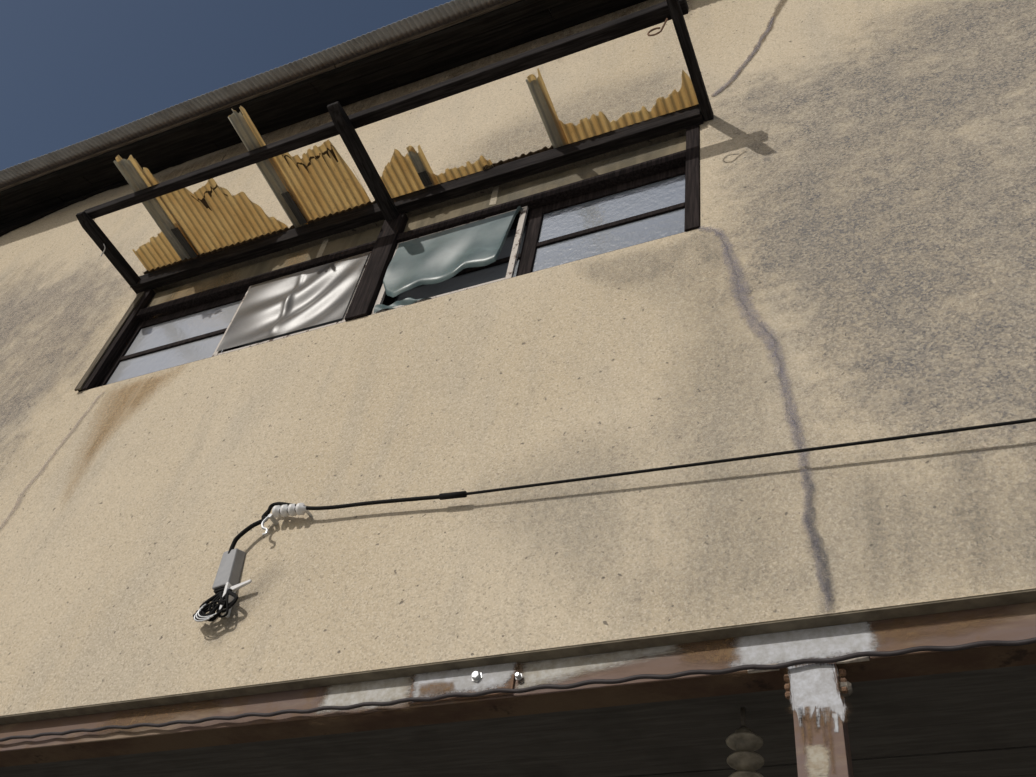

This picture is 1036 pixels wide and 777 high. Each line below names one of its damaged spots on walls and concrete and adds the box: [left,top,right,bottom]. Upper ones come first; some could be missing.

crack [711,0,786,96]
mould [747,0,1036,430]
crack [703,228,830,600]
peeling [318,622,878,777]